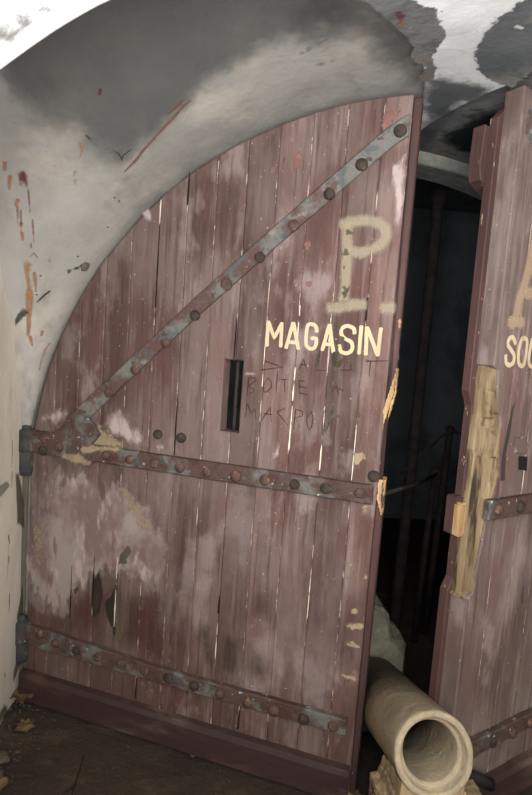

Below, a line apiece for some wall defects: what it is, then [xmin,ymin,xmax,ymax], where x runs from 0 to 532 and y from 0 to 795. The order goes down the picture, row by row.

damp [8,0,403,156]
peeling [361,0,446,81]
flaking render [474,0,532,88]
rust [25,264,43,346]